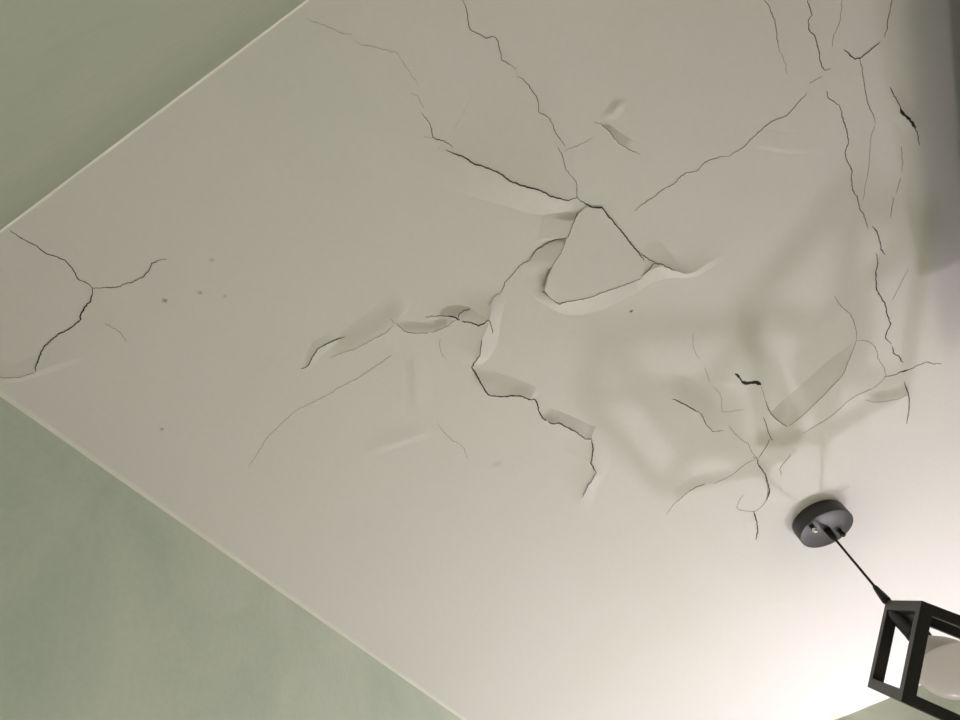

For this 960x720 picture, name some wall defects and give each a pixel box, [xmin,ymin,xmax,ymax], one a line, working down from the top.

crack [2,230,165,378]
crack [252,0,672,495]
crack [635,0,942,540]